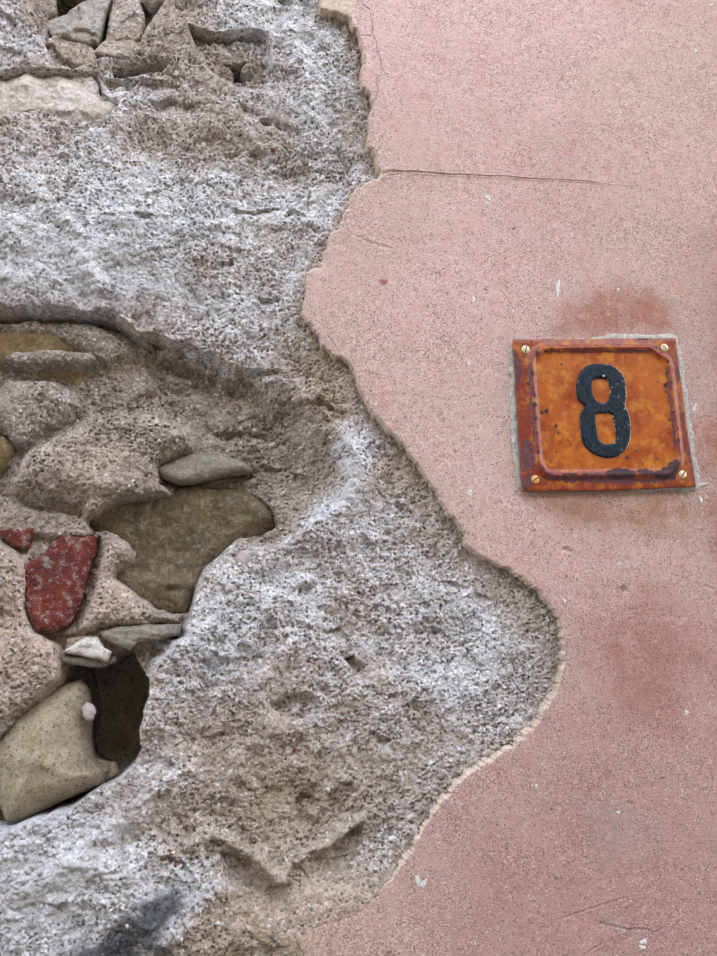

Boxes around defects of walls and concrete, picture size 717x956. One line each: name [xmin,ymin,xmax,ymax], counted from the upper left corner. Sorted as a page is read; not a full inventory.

crack [360,0,392,102]
crack [380,169,634,186]
spalling [0,0,566,956]
rust [514,338,695,490]